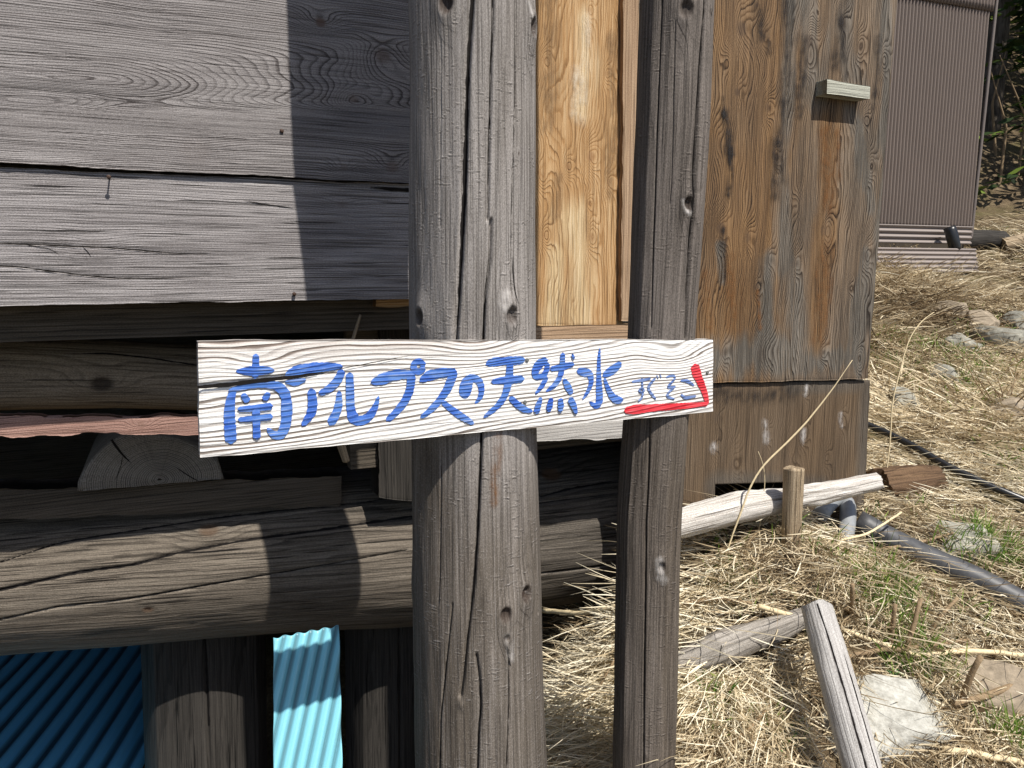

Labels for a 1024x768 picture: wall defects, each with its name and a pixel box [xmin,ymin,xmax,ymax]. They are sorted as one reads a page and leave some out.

crack [456,0,519,340]
crack [0,554,382,619]
crack [0,499,412,591]
crack [439,432,482,768]